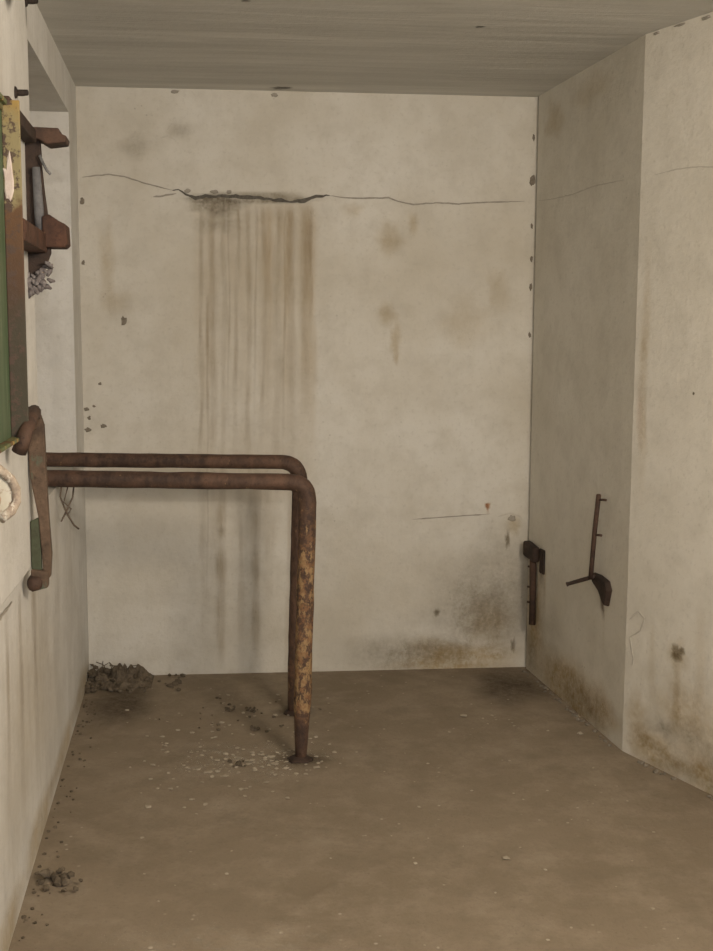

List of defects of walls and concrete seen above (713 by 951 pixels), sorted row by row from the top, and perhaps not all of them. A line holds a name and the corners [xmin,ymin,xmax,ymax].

crack [85,174,622,205]